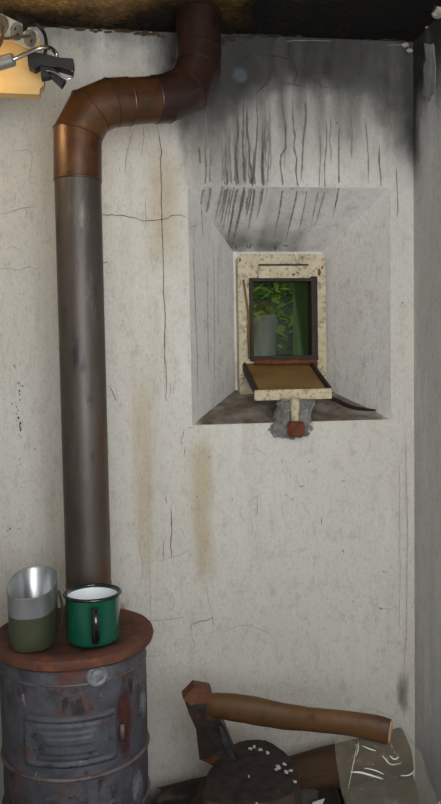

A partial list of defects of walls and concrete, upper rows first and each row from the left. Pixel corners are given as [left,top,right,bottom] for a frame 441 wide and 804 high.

leakage [198,105,271,229]
leakage [277,100,327,227]
crack [102,127,201,400]